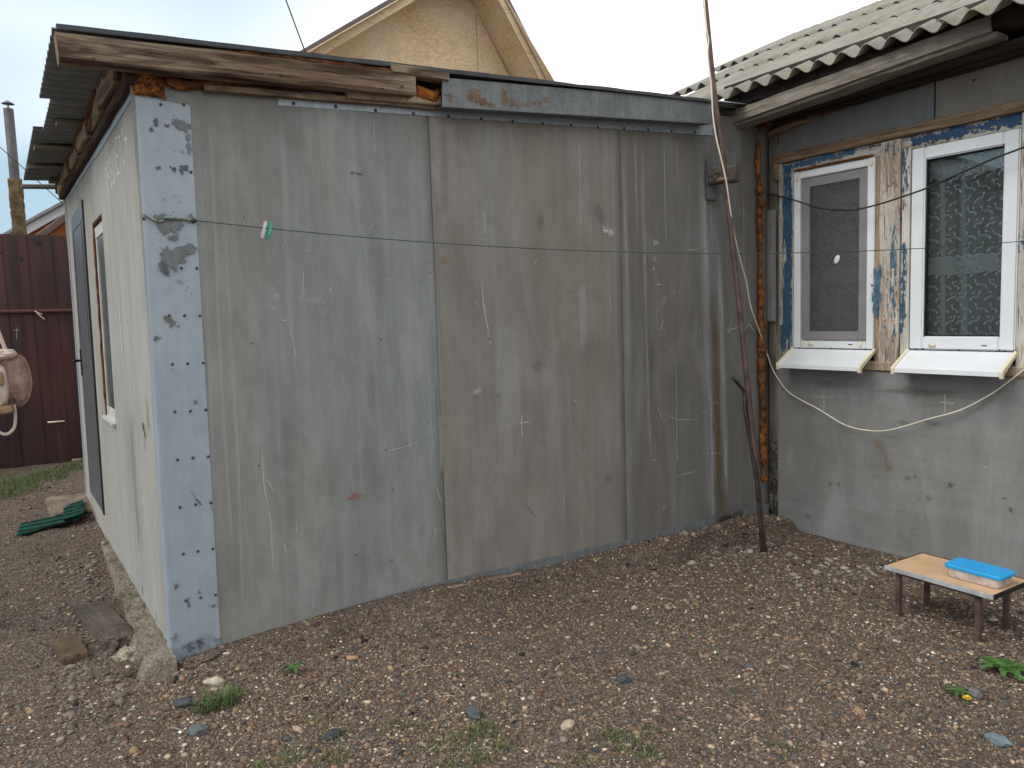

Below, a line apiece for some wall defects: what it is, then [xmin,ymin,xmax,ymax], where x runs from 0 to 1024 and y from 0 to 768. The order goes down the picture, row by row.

peeling [150,115,192,175]
corrosion [467,90,546,107]
peeling [153,194,197,308]
peeling [781,112,1023,352]